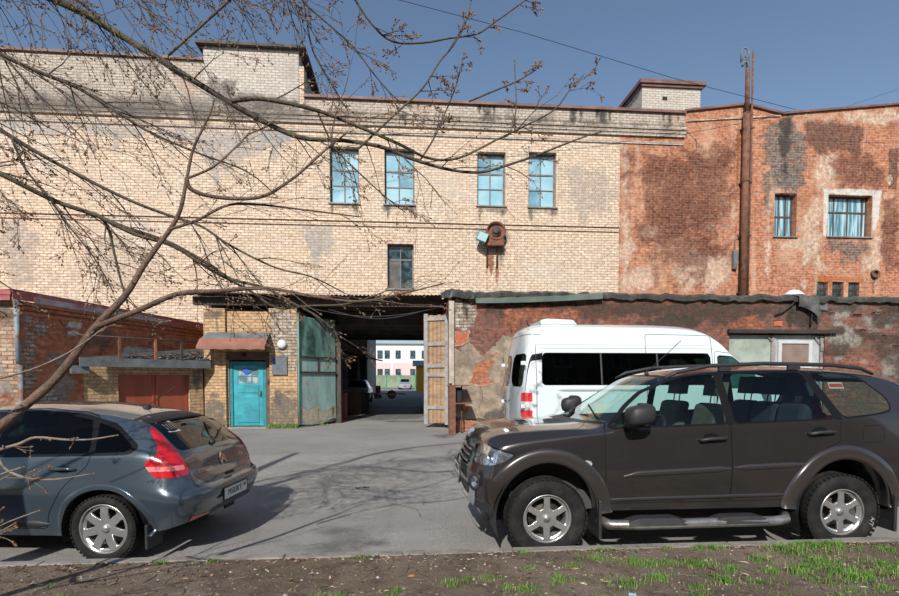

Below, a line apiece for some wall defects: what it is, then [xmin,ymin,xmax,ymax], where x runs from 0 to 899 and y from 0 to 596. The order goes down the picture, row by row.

water stain [617,144,739,293]
water stain [763,106,899,294]
peeling [454,299,477,347]
flaking render [467,352,500,387]
flaking render [456,404,478,431]